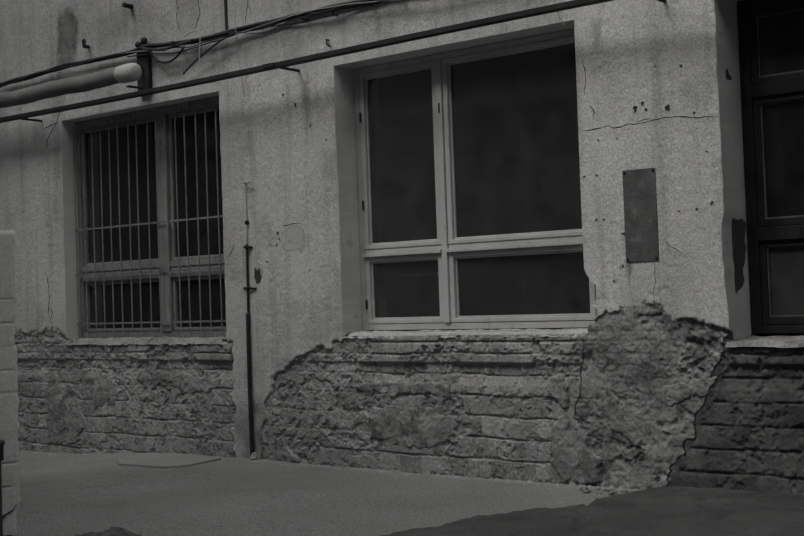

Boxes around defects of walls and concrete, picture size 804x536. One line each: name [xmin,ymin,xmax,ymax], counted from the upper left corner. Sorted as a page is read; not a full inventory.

crack [582,59,718,131]
flaking render [14,328,236,457]
flaking render [262,299,804,495]